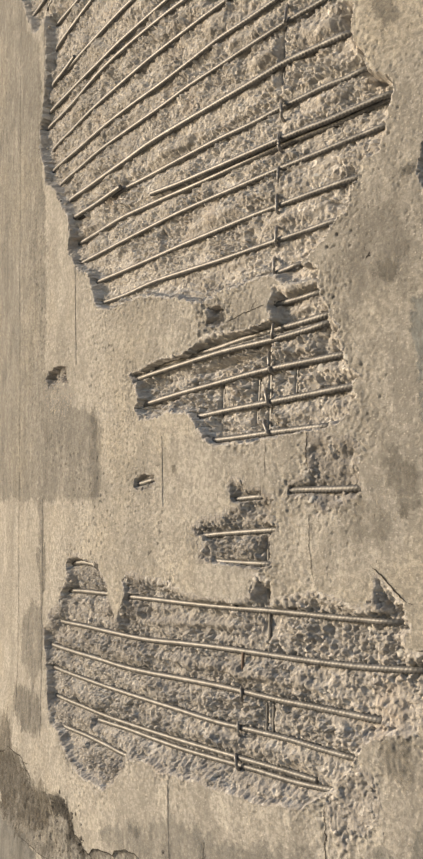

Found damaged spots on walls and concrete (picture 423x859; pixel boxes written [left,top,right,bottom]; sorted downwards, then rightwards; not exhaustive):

spalling [21,0,394,516]
spalling [415,138,423,195]
crack [71,822,138,859]
spalling [43,476,423,851]